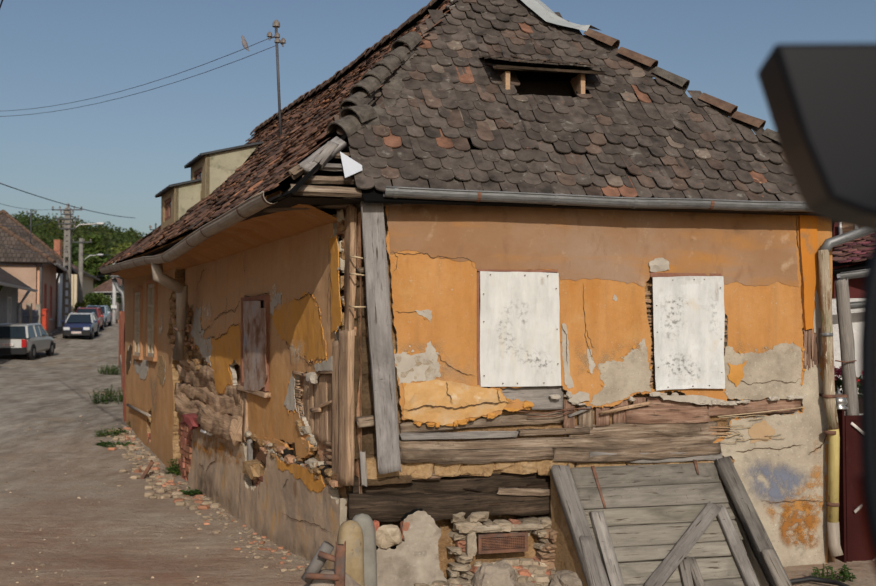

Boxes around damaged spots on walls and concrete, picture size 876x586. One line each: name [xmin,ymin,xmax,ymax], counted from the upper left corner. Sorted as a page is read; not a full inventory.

peeling [169,292,241,394]
flaking render [192,291,352,507]
crack [562,287,594,363]
peeling [394,288,829,567]